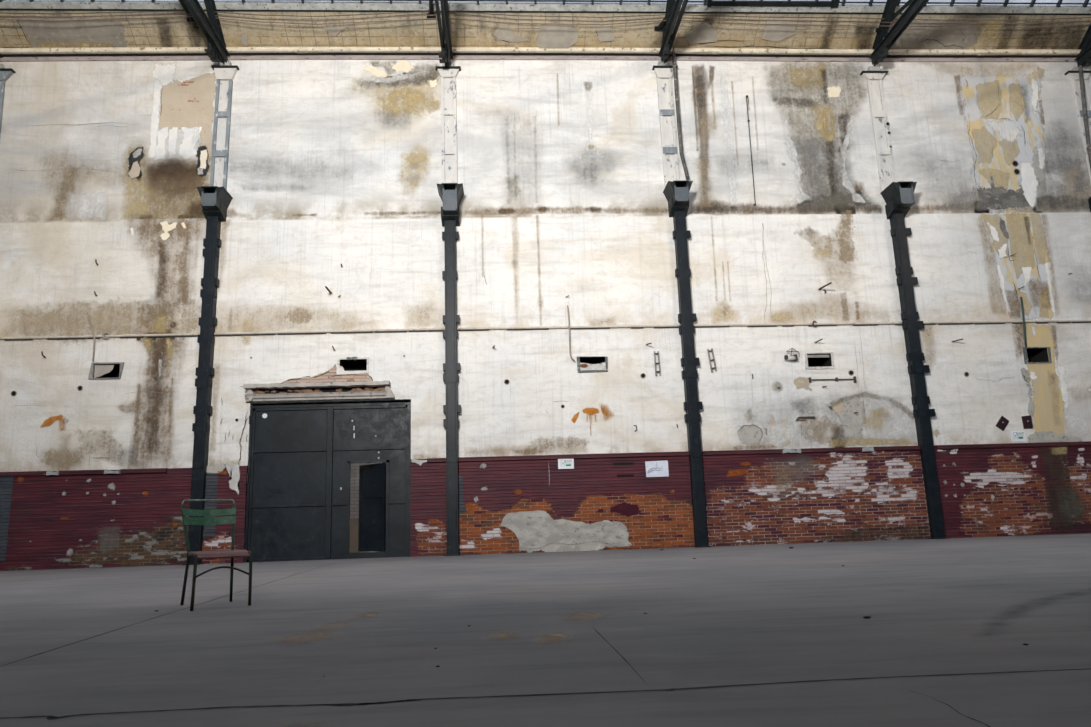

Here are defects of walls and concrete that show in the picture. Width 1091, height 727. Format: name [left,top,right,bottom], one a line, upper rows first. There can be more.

water stain [770,62,879,273]
peeling [937,67,1091,537]
rust [41,415,69,430]
rust [572,406,611,429]
peeling [415,447,931,556]